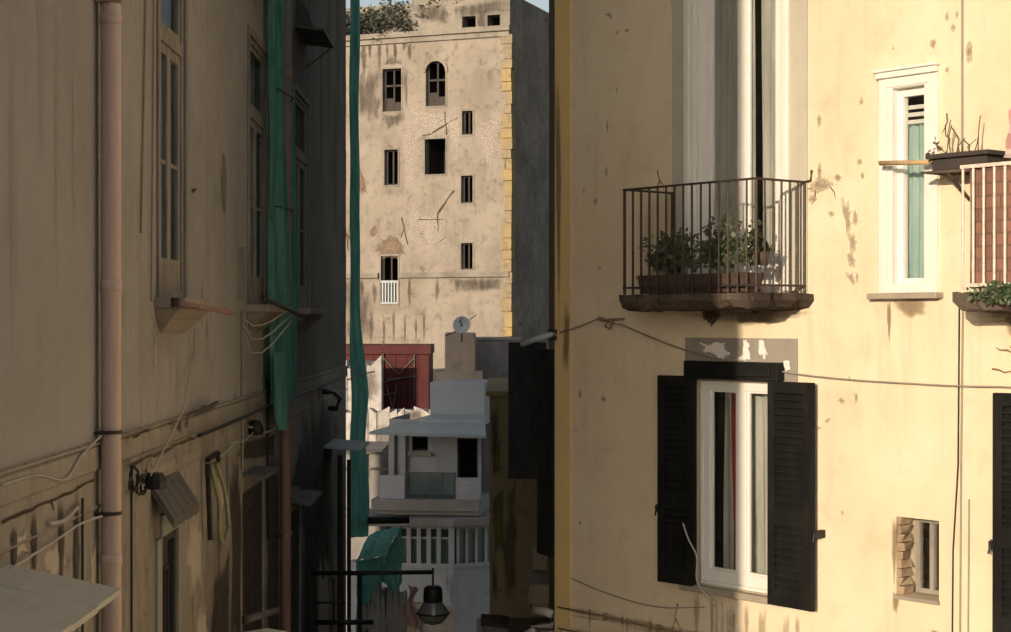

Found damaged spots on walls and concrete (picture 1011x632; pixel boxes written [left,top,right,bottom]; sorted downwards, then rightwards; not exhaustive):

water stain [362,43,411,67]
water stain [359,80,374,110]
peeling [808,163,841,203]
peeling [370,227,405,258]
peeling [828,198,858,285]
water stain [457,280,498,289]
water stain [346,283,425,338]
crack [992,347,1011,373]